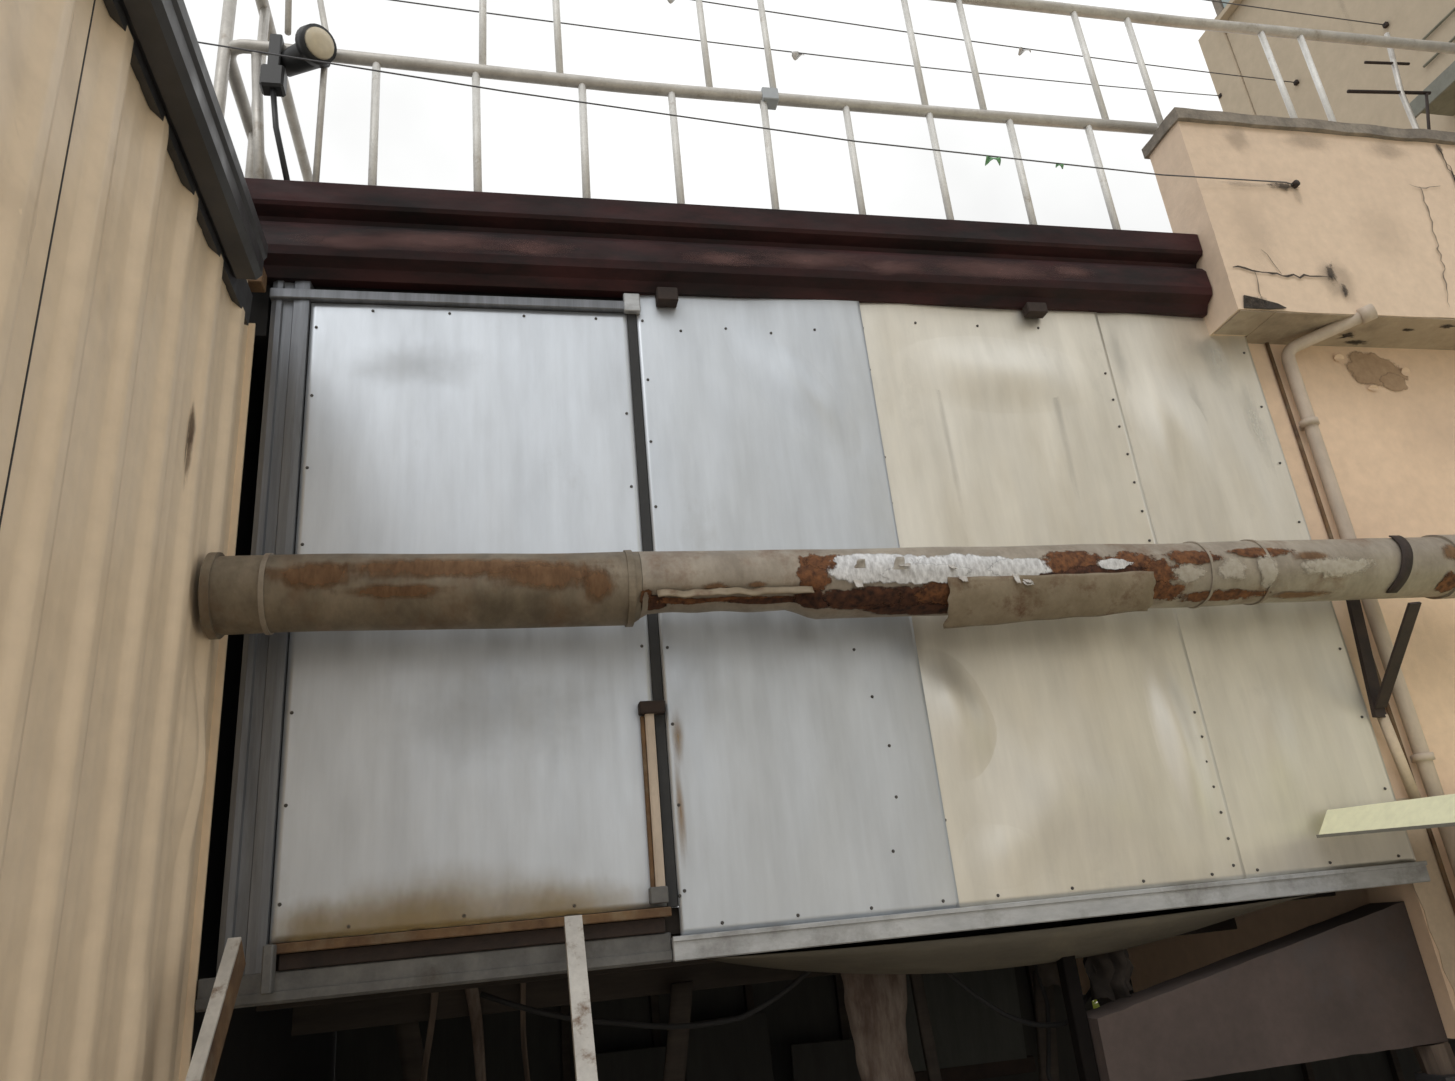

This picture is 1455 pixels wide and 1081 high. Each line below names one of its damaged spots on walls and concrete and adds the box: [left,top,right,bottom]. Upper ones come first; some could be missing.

crack [1412,145,1455,304]
crack [1234,250,1327,298]
peeling [1334,351,1411,391]
rust [640,553,950,615]
peeling [829,553,1052,588]
peeling [1098,559,1134,570]
rust [1039,547,1329,602]
rust [1435,545,1455,593]